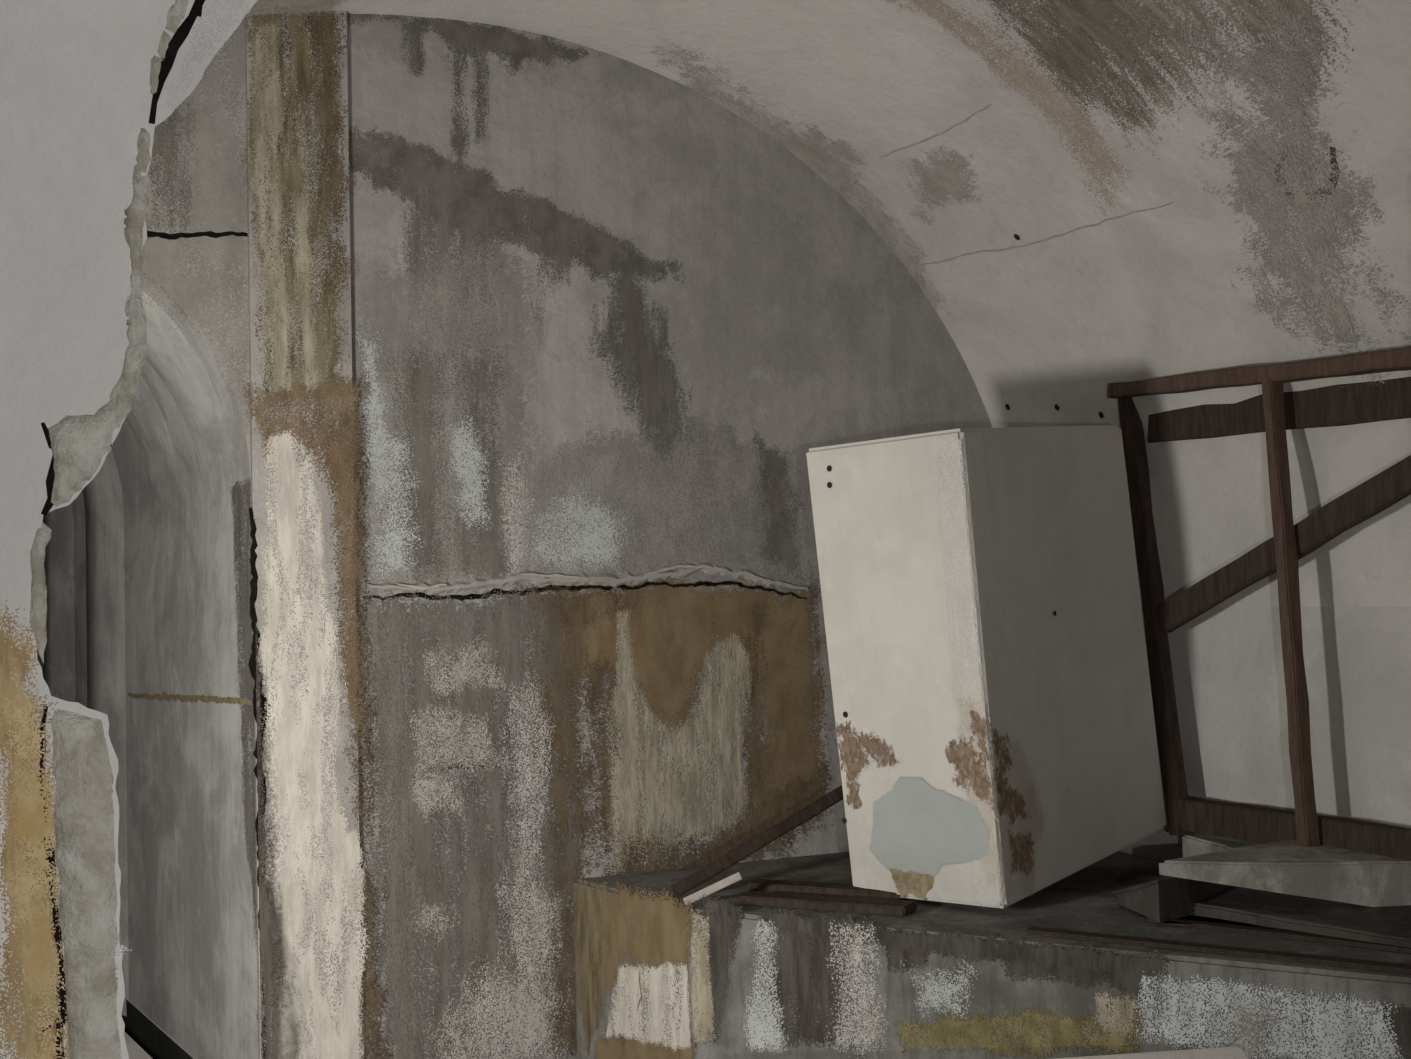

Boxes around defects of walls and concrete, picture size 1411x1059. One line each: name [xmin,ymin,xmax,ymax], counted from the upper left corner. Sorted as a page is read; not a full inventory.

spalling [150,0,189,94]
damp [650,42,986,318]
damp [886,0,1411,357]
spalling [30,128,153,663]
rust [239,10,391,1059]
damp [142,0,834,1059]
spalling [363,562,808,601]
spalling [405,635,512,824]
spalling [44,709,132,1059]
spalling [407,899,461,946]
damp [743,906,1411,1059]